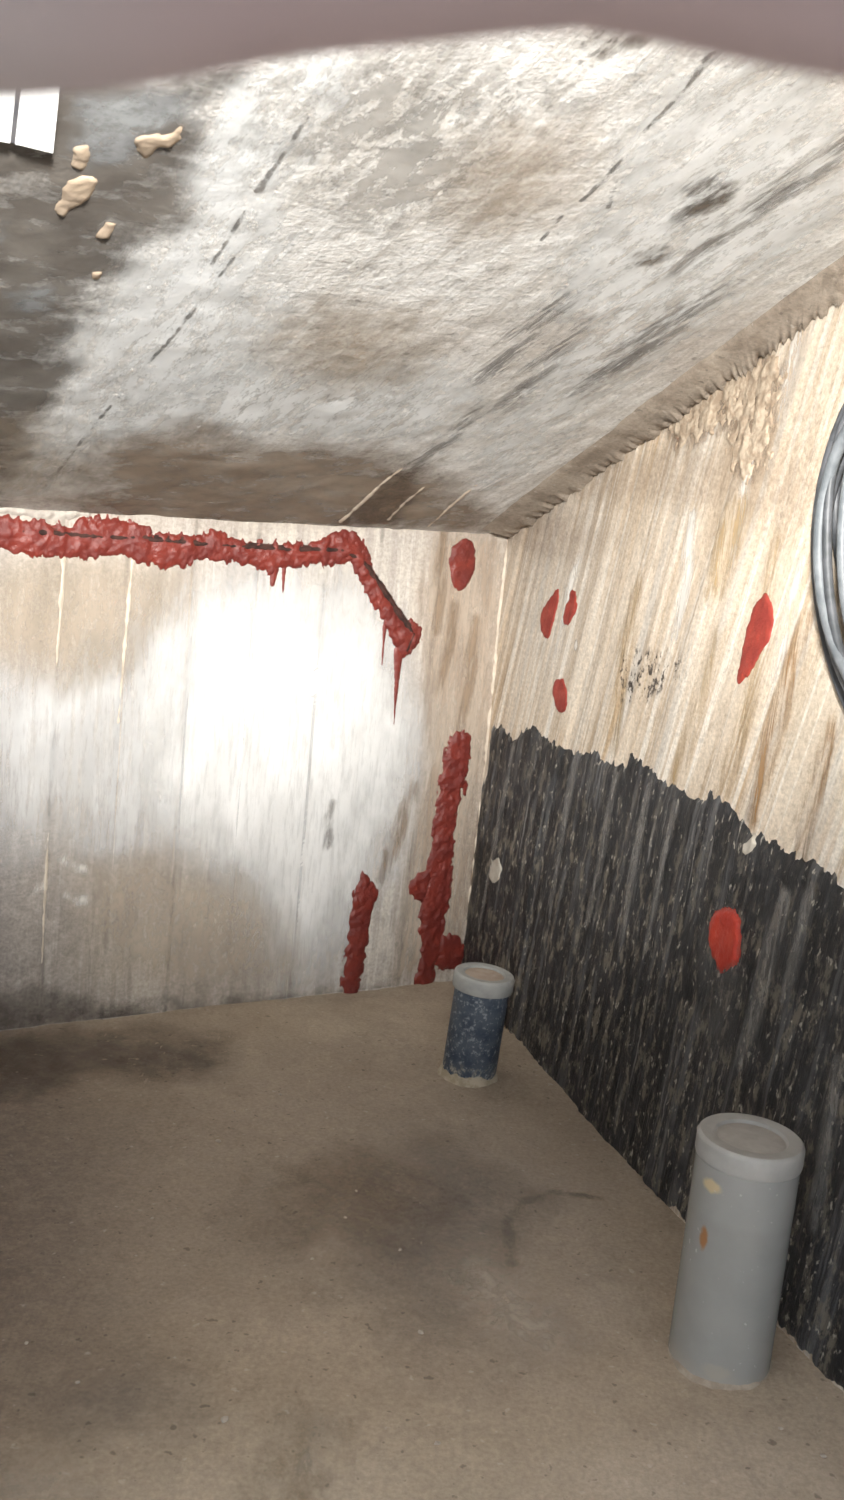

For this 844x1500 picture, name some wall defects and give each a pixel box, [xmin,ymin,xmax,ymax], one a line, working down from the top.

peeling [55,145,98,218]
peeling [96,222,116,239]
peeling [134,126,183,158]
crack [212,125,303,276]
crack [153,309,195,359]
water stain [0,68,844,994]
water stain [738,891,813,1066]
water stain [813,1059,844,1230]